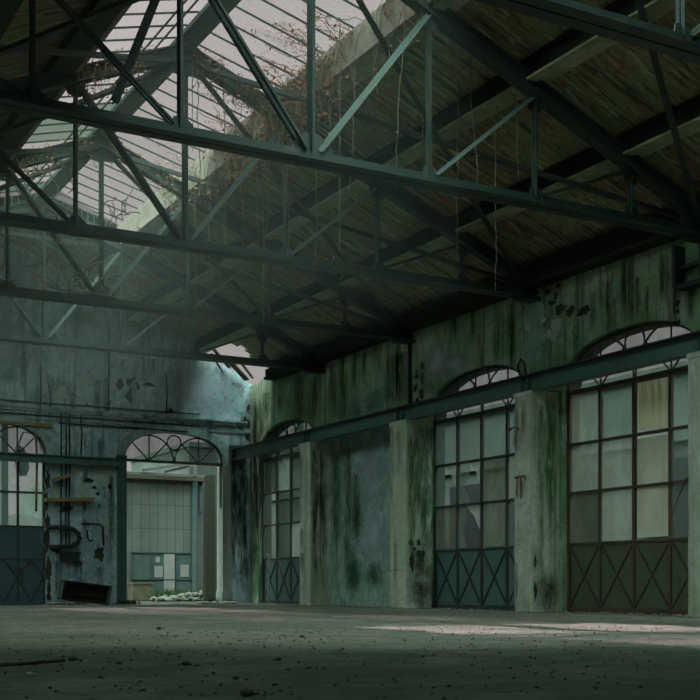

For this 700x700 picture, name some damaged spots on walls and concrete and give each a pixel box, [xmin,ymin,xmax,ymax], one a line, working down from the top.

peeling [523,282,592,368]
flaking render [115,376,156,404]
peeling [76,477,112,580]
damp [231,455,262,561]
damp [312,451,381,566]
spalling [408,538,426,576]
damp [409,429,434,535]
damp [538,400,557,529]